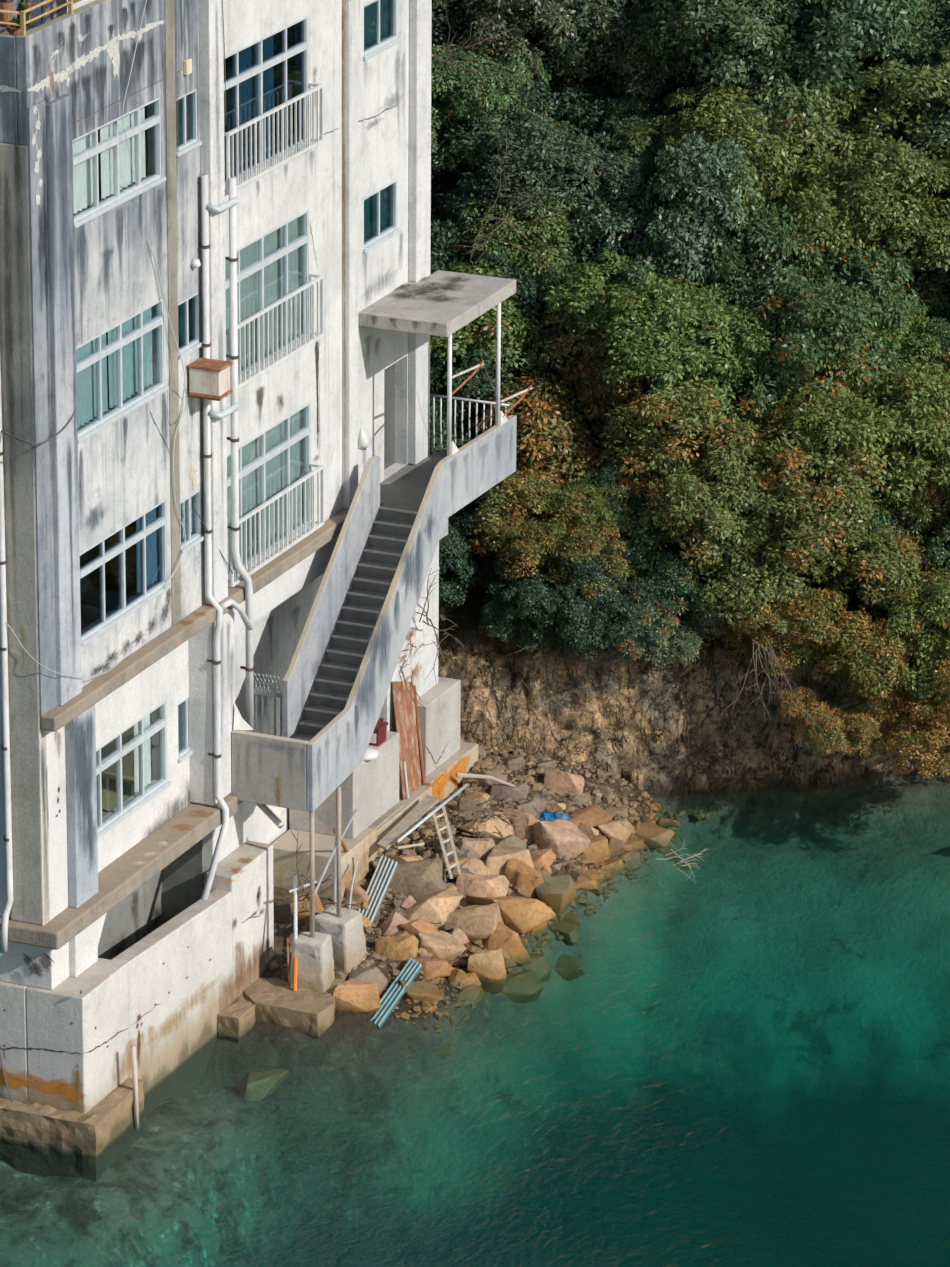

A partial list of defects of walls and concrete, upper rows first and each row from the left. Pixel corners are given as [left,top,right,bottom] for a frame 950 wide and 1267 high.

damp [58,15,90,58]
damp [110,0,150,35]
damp [122,0,188,127]
damp [104,211,123,278]
damp [0,67,106,508]
damp [68,450,103,597]
corrosion [391,681,468,801]
damp [74,716,93,857]
corrosion [223,944,269,1006]
crack [0,1004,160,1054]
corrosion [0,1050,83,1111]